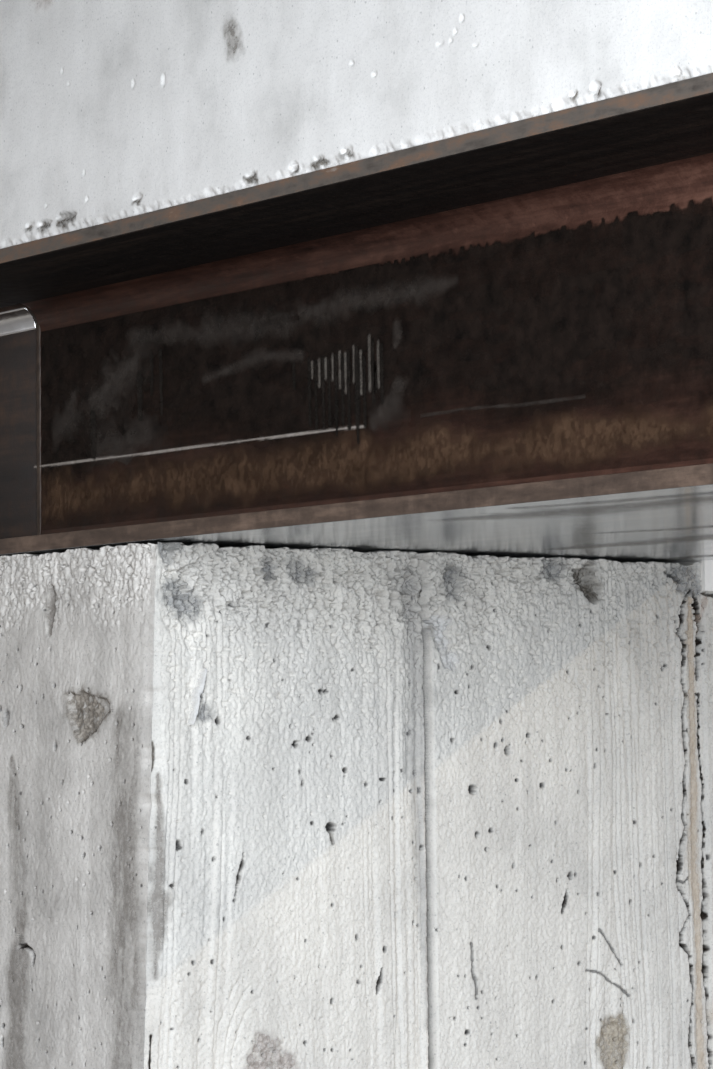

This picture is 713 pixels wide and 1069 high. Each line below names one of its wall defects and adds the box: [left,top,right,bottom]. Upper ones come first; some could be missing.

rust [46,417,686,518]
spalling [66,688,111,742]
crack [666,576,713,1065]
damp [112,774,168,1006]
damp [8,909,28,1069]
spalling [247,1034,295,1069]
spalling [596,1014,628,1069]